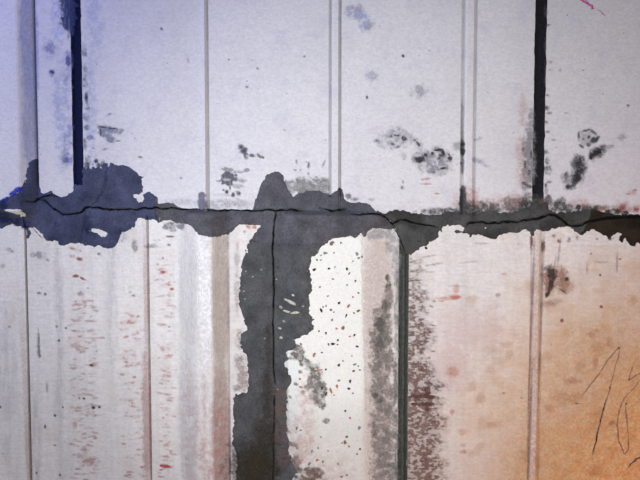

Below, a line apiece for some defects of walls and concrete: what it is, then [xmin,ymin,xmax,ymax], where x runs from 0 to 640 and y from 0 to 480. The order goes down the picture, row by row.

crack [22,165,300,378]
leakage [212,236,280,480]
crack [269,394,277,479]
crack [325,209,438,251]
leakage [366,229,399,480]
corrosion [407,278,445,480]
leakage [413,148,452,173]
leakage [424,112,629,215]
crack [466,214,640,228]
corrosion [511,236,640,480]